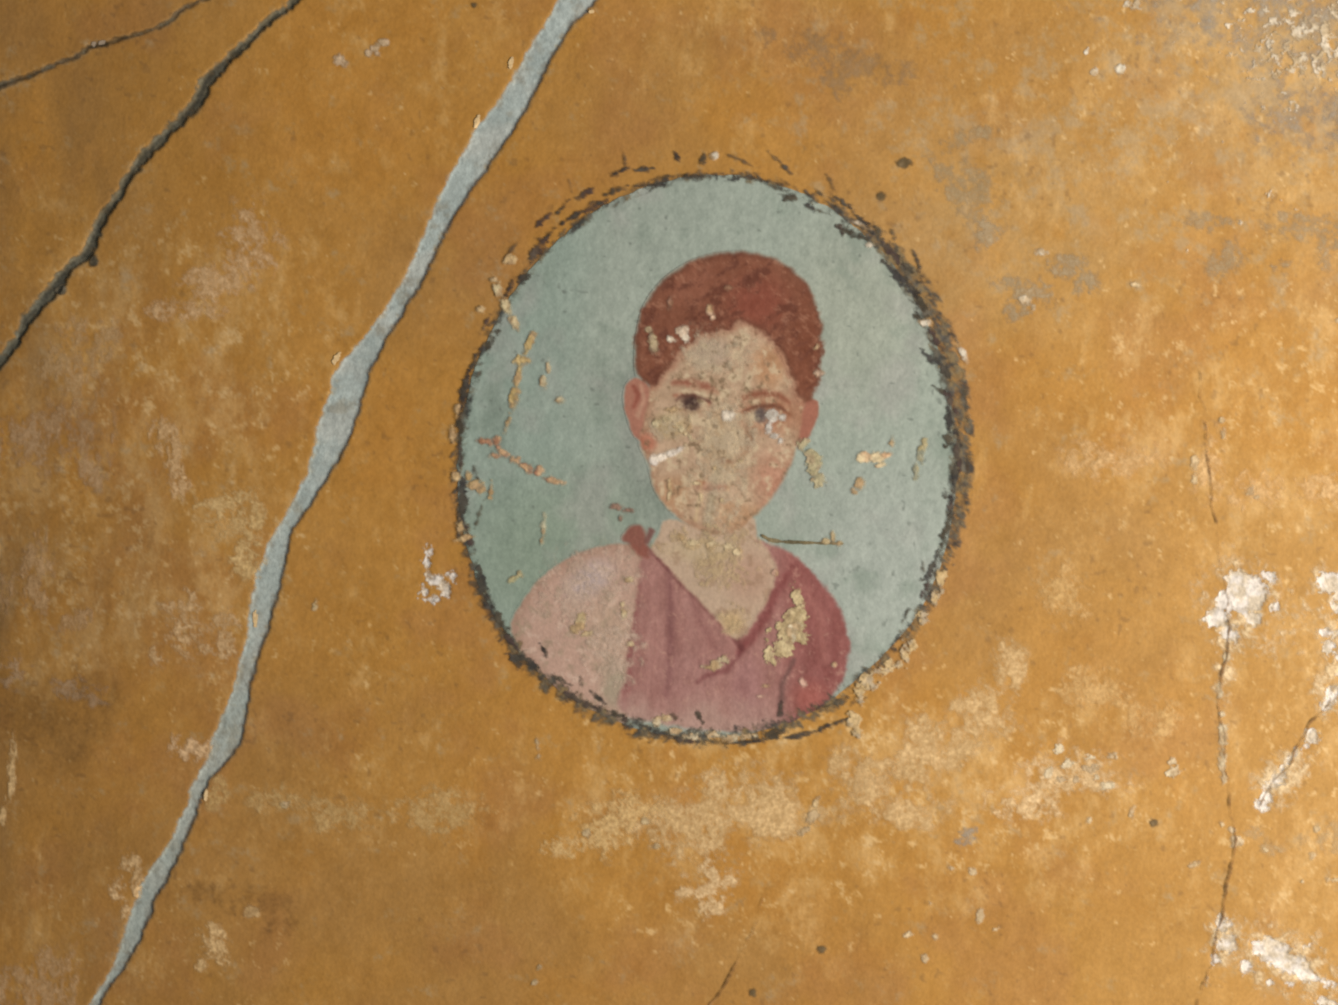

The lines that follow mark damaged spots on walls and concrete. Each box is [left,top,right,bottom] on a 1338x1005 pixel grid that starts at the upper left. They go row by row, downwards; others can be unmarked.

crack [0,0,300,369]
peeling [645,326,689,352]
peeling [765,409,824,488]
crack [90,0,596,1005]
spalling [1202,568,1280,662]
spalling [1316,571,1338,613]
crack [1219,621,1231,755]
spalling [1319,627,1338,715]
spalling [1254,728,1321,813]
crack [1283,705,1328,772]
crack [1203,798,1262,985]
spalling [1206,913,1338,1005]